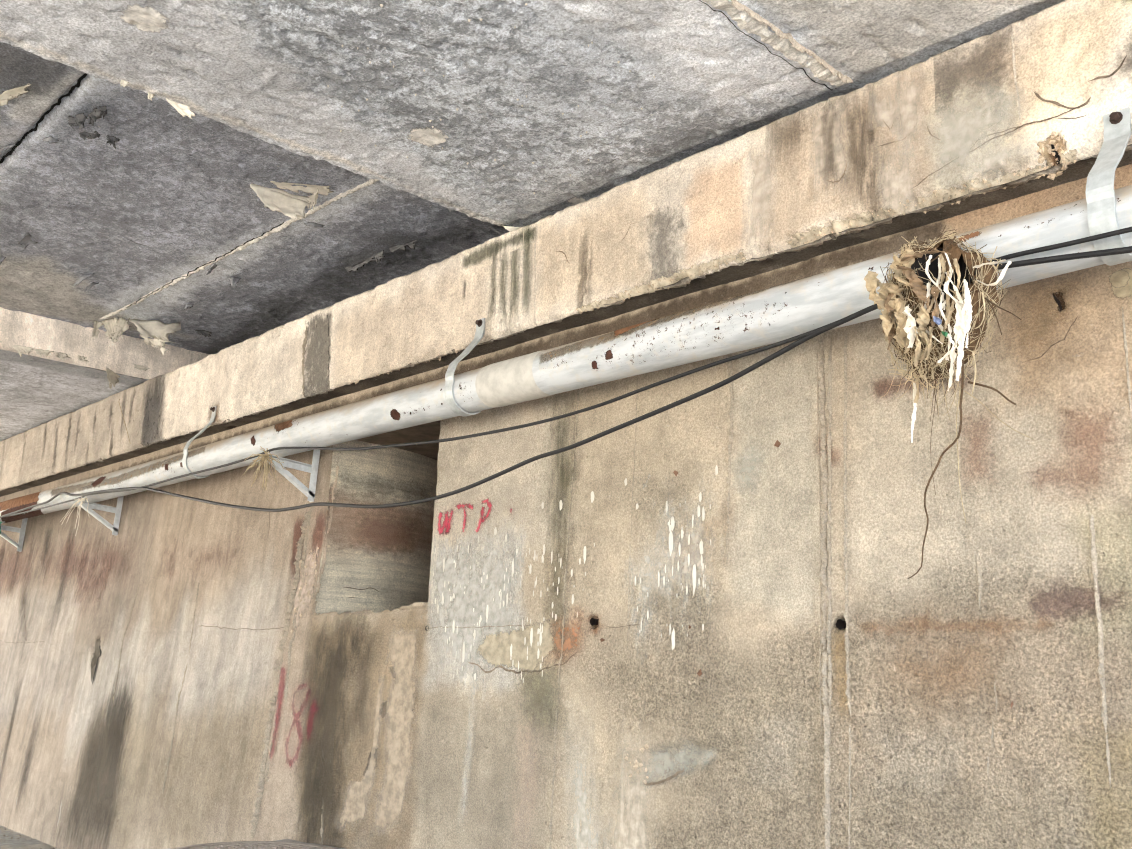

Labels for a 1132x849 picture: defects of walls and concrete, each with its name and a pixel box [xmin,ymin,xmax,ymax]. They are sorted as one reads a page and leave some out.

peeling [0,83,31,106]
peeling [250,181,334,228]
spalling [786,131,1077,248]
peeling [345,240,417,272]
water stain [491,235,529,311]
peeling [91,304,194,355]
spalling [624,744,684,786]